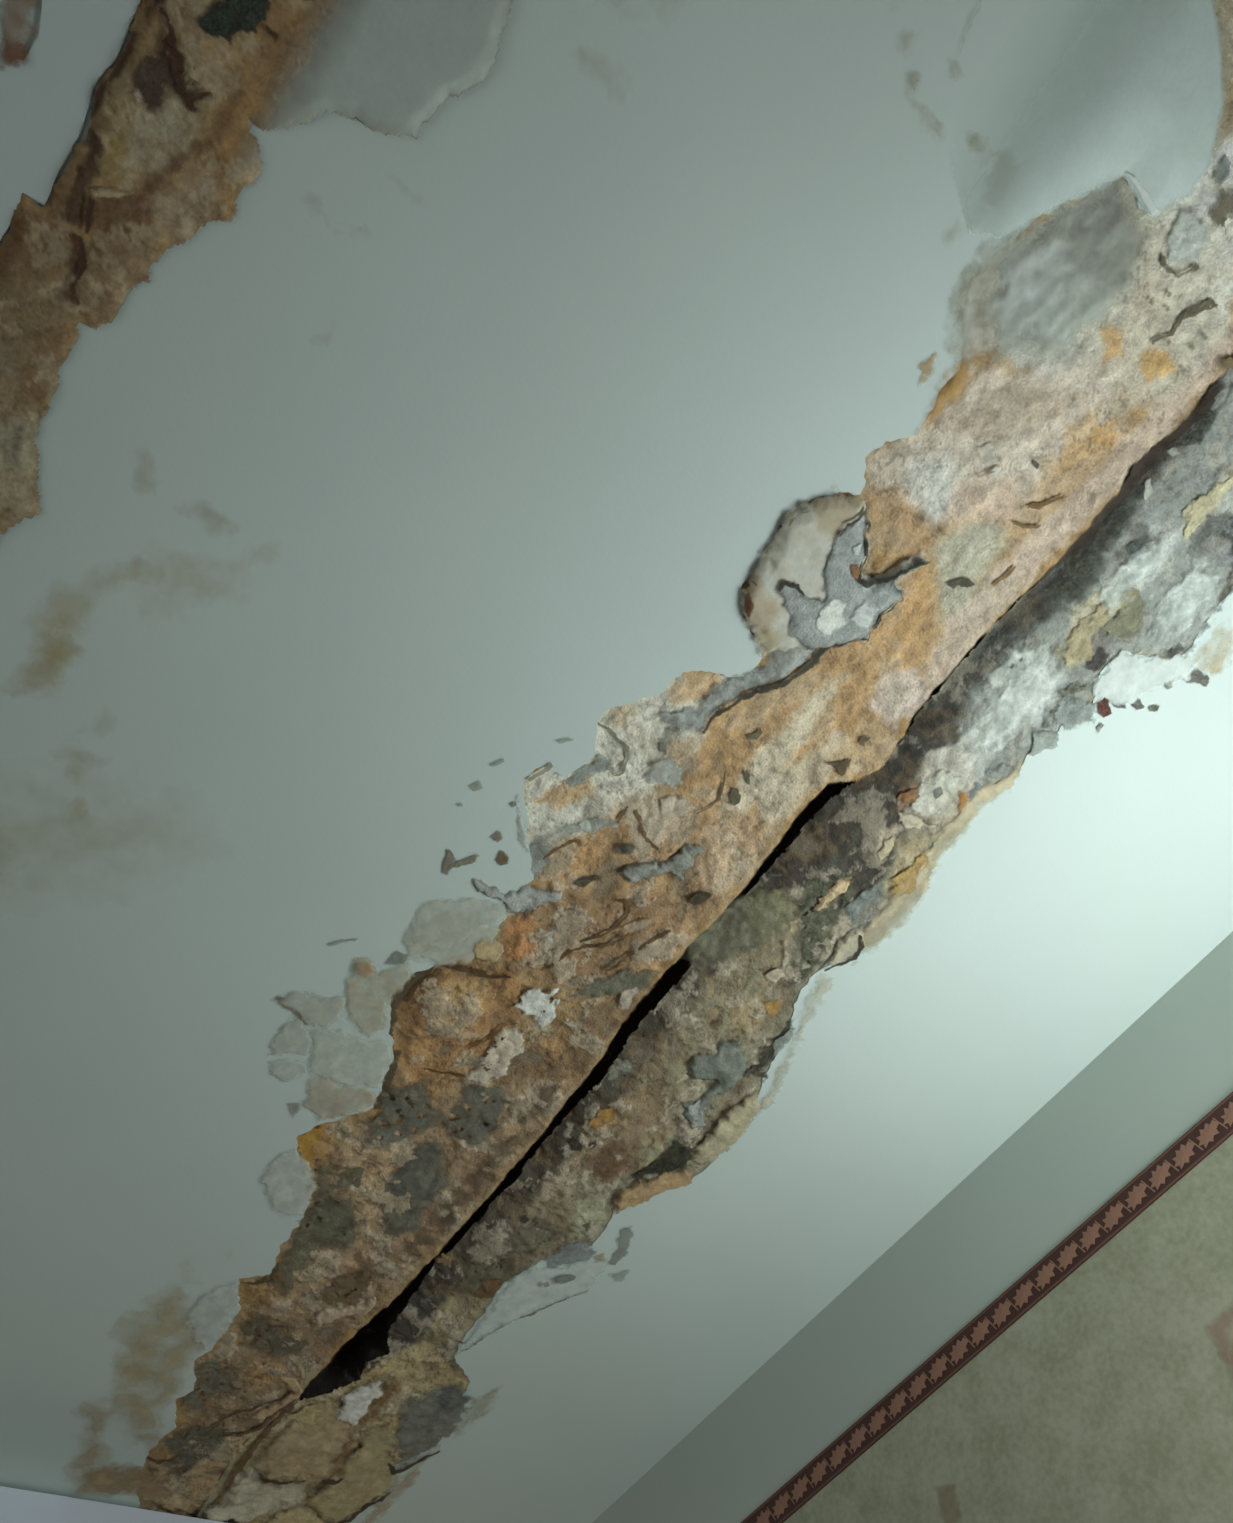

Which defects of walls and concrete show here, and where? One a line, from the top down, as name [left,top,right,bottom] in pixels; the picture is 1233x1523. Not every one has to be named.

peeling [0,0,487,535]
flaking render [920,354,937,382]
crack [897,382,1225,744]
crack [209,775,867,1509]
flaking render [196,370,1233,1523]